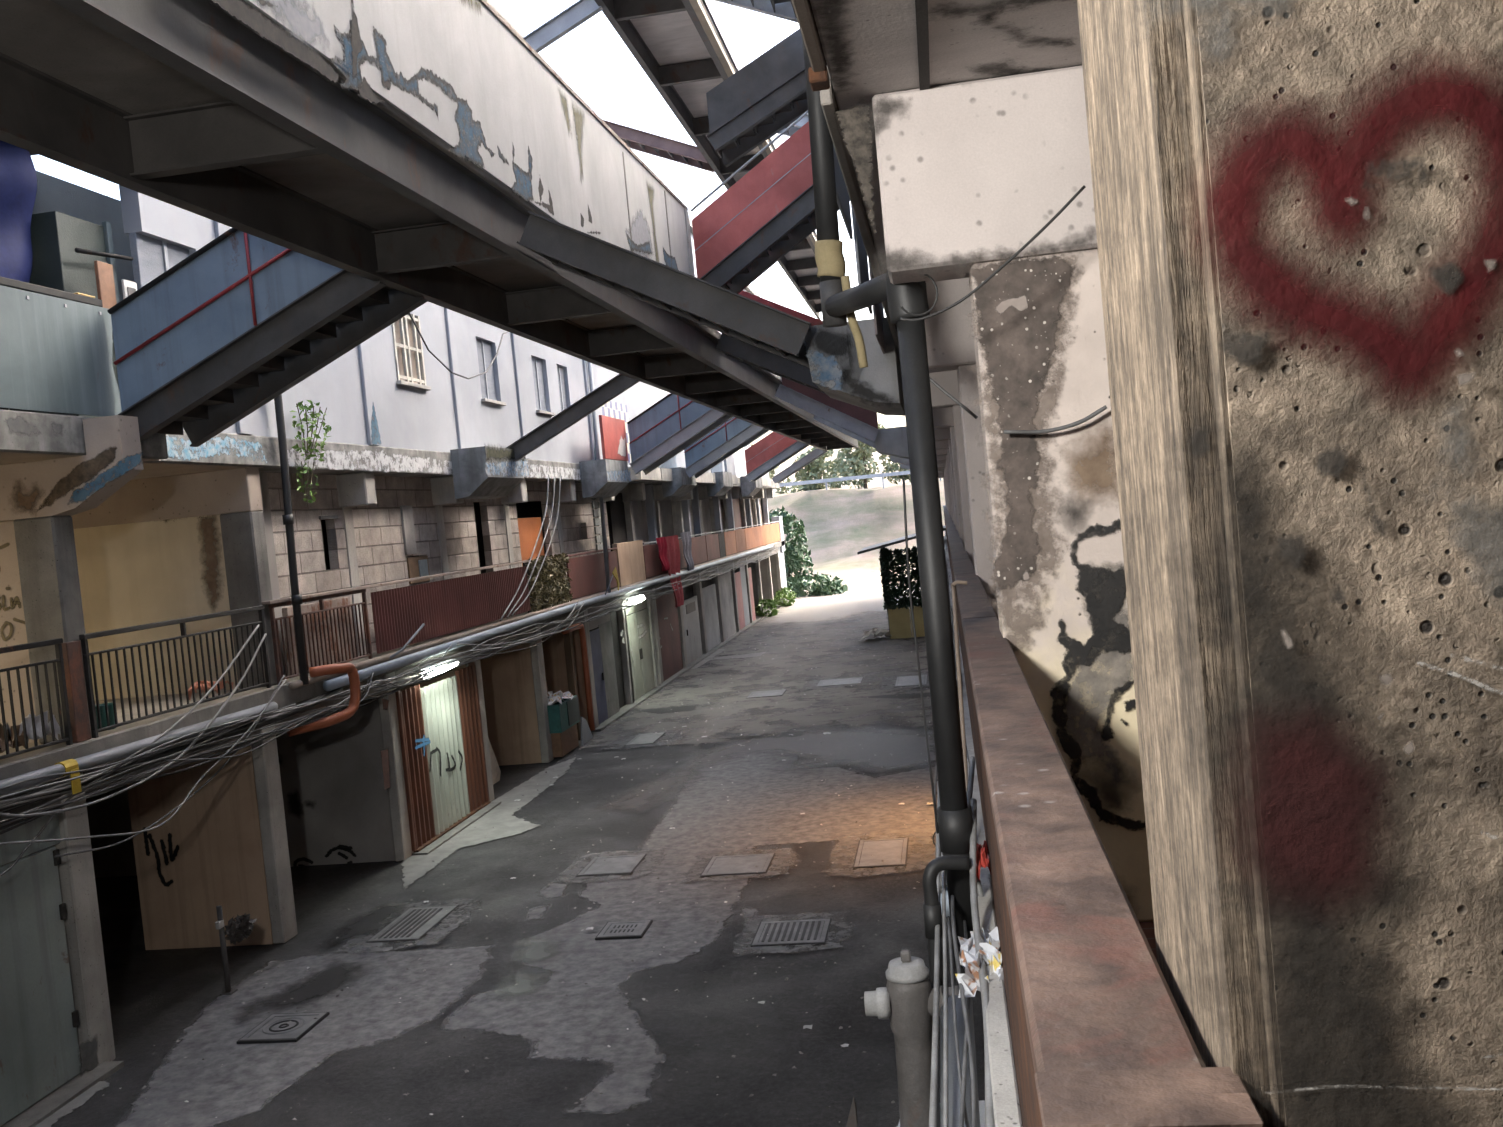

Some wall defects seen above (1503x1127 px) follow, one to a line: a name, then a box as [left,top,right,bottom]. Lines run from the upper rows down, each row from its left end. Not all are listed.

peeling [627,234,678,270]
spalling [39,447,143,509]
leakage [199,515,221,608]